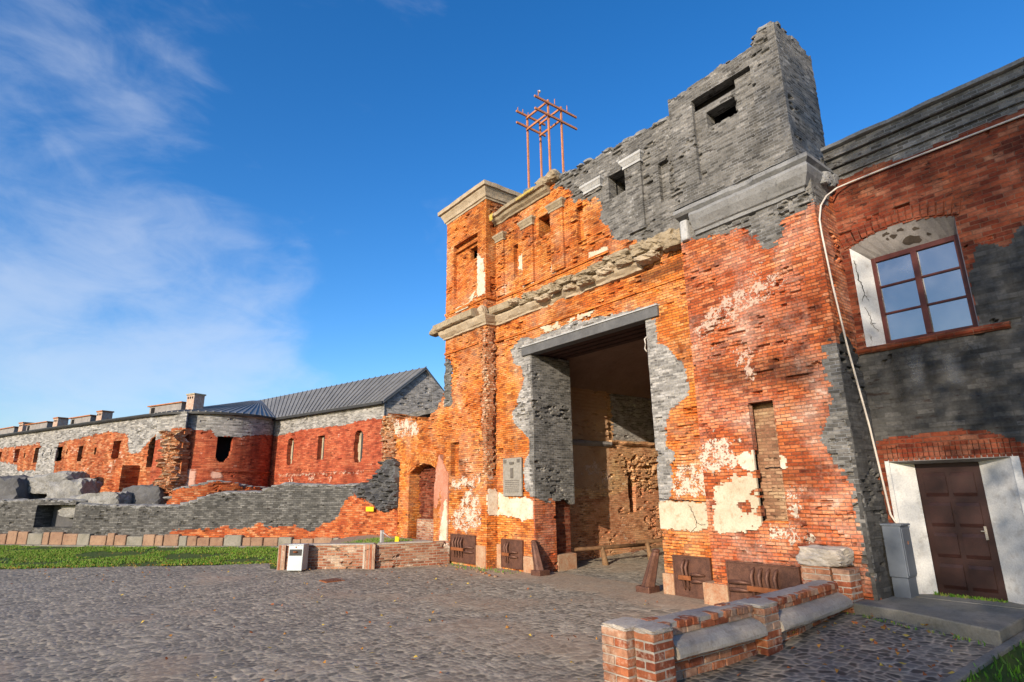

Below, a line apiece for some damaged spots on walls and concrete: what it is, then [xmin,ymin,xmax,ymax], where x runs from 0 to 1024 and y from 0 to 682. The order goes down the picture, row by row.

spalling [523,116,669,193]
spalling [680,220,691,242]
crack [853,260,879,341]
spalling [152,429,194,493]
spalling [350,414,419,512]
spalling [439,327,534,541]
flaking render [623,429,815,546]